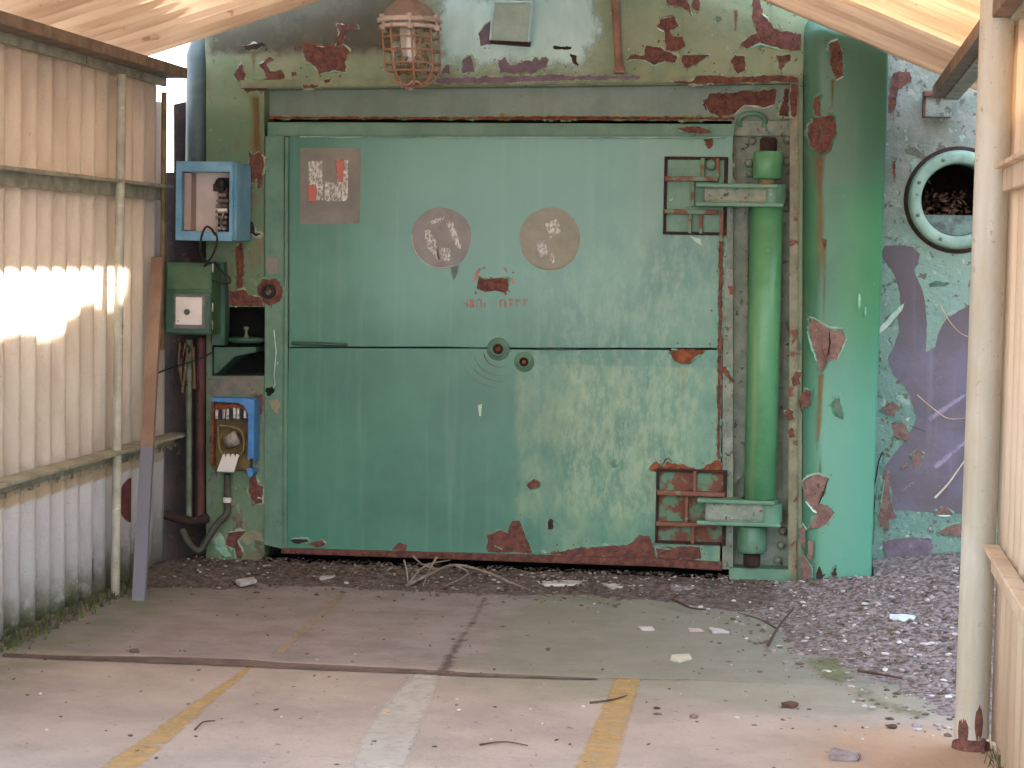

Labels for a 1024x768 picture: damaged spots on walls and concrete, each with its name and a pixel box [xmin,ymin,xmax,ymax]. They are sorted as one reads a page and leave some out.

peeling [433,15,715,89]
peeling [735,0,803,58]
corrosion [233,40,735,190]
peeling [702,86,790,121]
corrosion [229,242,285,308]
corrosion [475,272,514,297]
corrosion [646,236,735,475]
peeling [791,313,855,436]
peeling [875,397,962,557]
corrosion [484,514,705,560]
peeling [793,469,844,581]
corrosion [955,705,988,746]